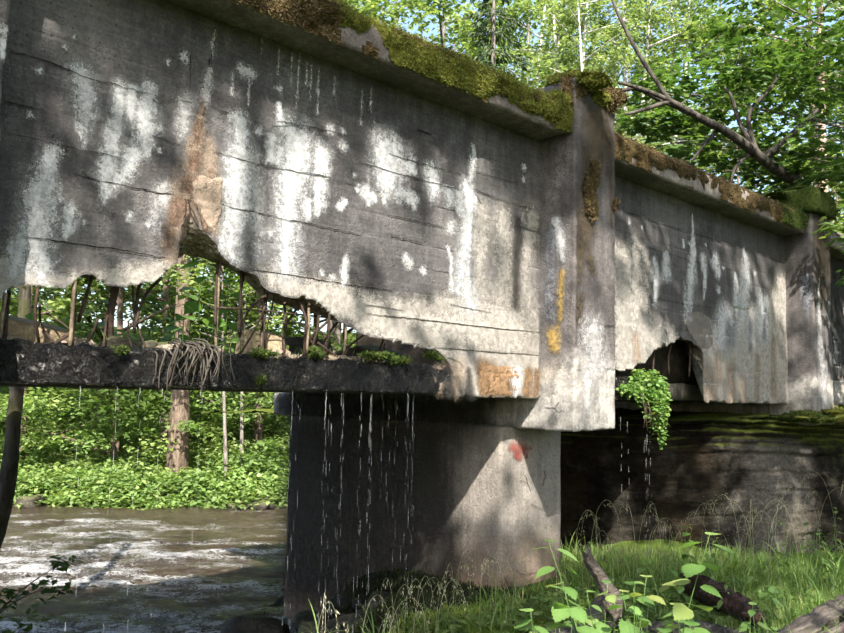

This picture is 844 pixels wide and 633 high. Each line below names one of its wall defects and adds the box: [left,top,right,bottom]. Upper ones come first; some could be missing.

efflorescence [177,94,193,137]
damp [146,184,169,235]
rust [166,104,216,261]
spalling [178,175,352,328]
damp [218,56,565,610]
rust [437,362,466,396]
rust [477,361,540,397]
damp [614,239,676,371]
spalling [653,337,703,370]
damp [682,213,725,319]
damp [697,248,788,403]
damp [801,214,844,409]